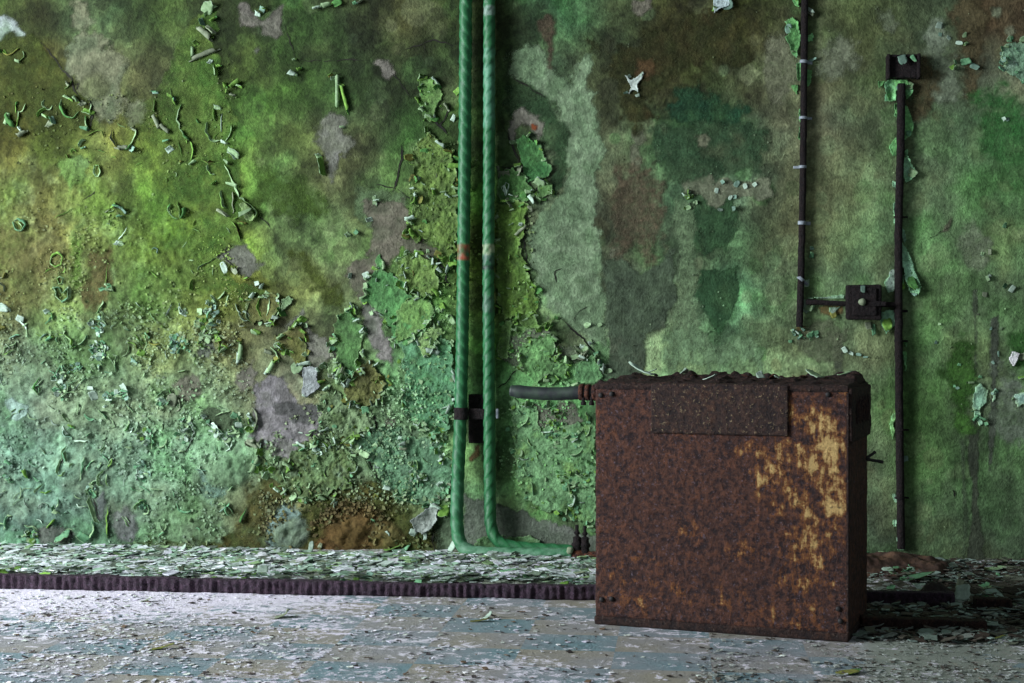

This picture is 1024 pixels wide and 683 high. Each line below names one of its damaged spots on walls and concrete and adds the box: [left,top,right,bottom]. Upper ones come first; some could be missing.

peeling [0,0,243,181]
peeling [0,73,613,553]
peeling [889,269,924,296]